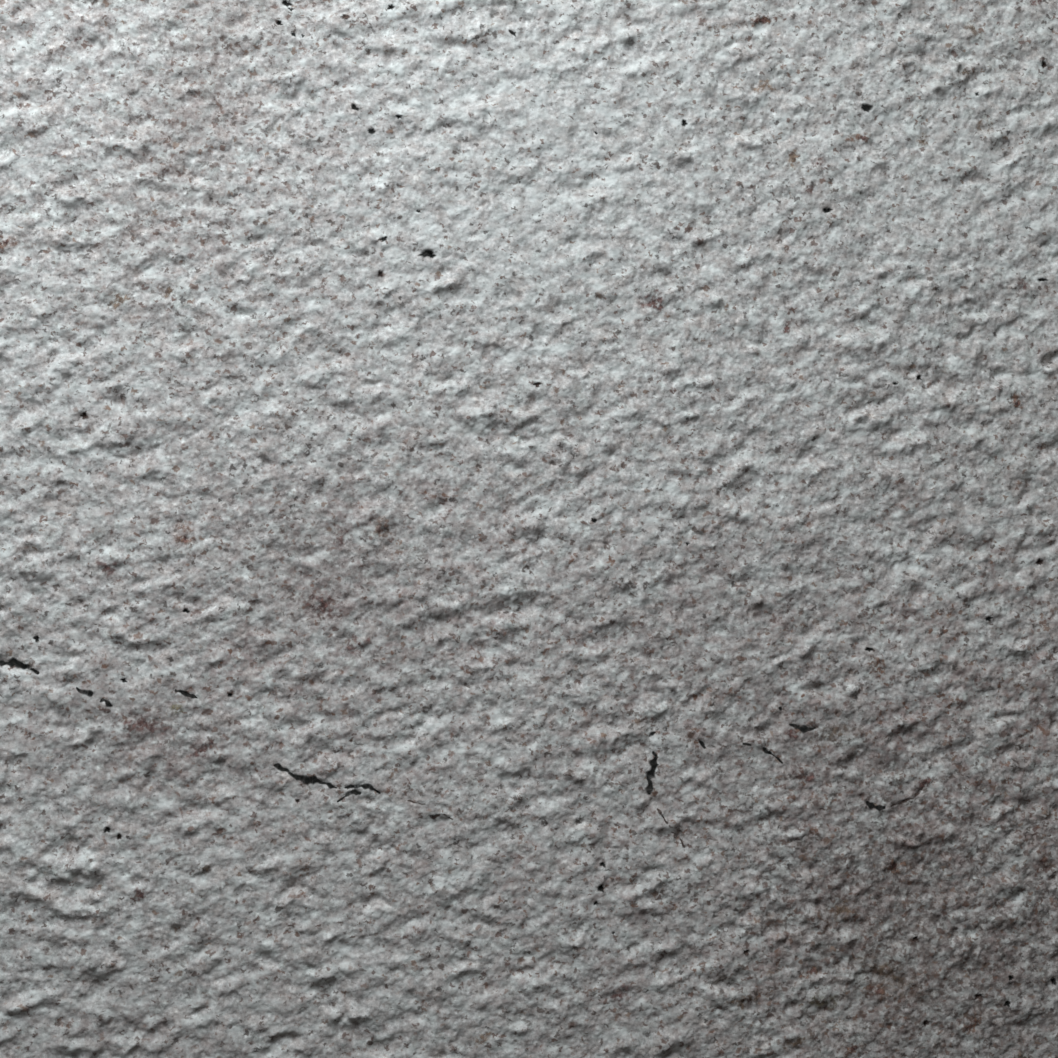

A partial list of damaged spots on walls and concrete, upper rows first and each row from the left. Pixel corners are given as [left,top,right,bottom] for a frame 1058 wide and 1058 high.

crack [0,658,39,674]
crack [76,687,112,707]
crack [175,689,198,699]
crack [789,724,816,733]
crack [743,743,783,764]
crack [273,763,381,802]
crack [646,731,685,848]
crack [866,787,923,810]